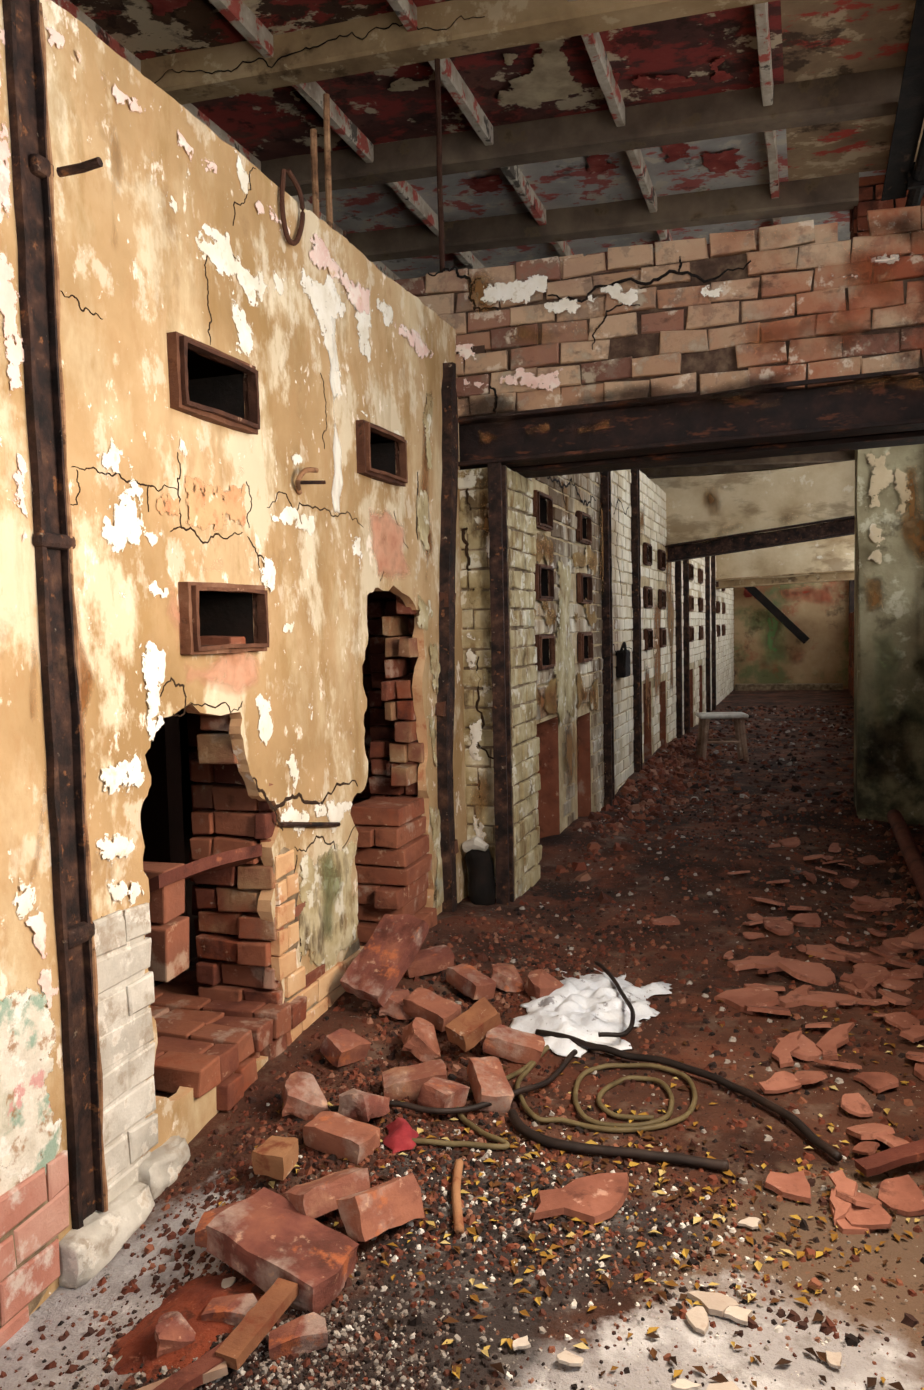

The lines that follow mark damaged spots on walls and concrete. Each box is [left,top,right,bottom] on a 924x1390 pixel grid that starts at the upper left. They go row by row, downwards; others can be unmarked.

crack [154,16,485,84]
peeling [497,38,584,107]
peeling [476,274,638,314]
crack [548,256,751,350]
crack [70,452,419,581]
water stain [904,469,924,559]
peeling [139,641,166,741]
peeling [100,753,145,795]
spalling [374,585,444,909]
flaking render [183,693,364,1042]
crack [253,777,358,962]
peeling [0,877,69,1347]